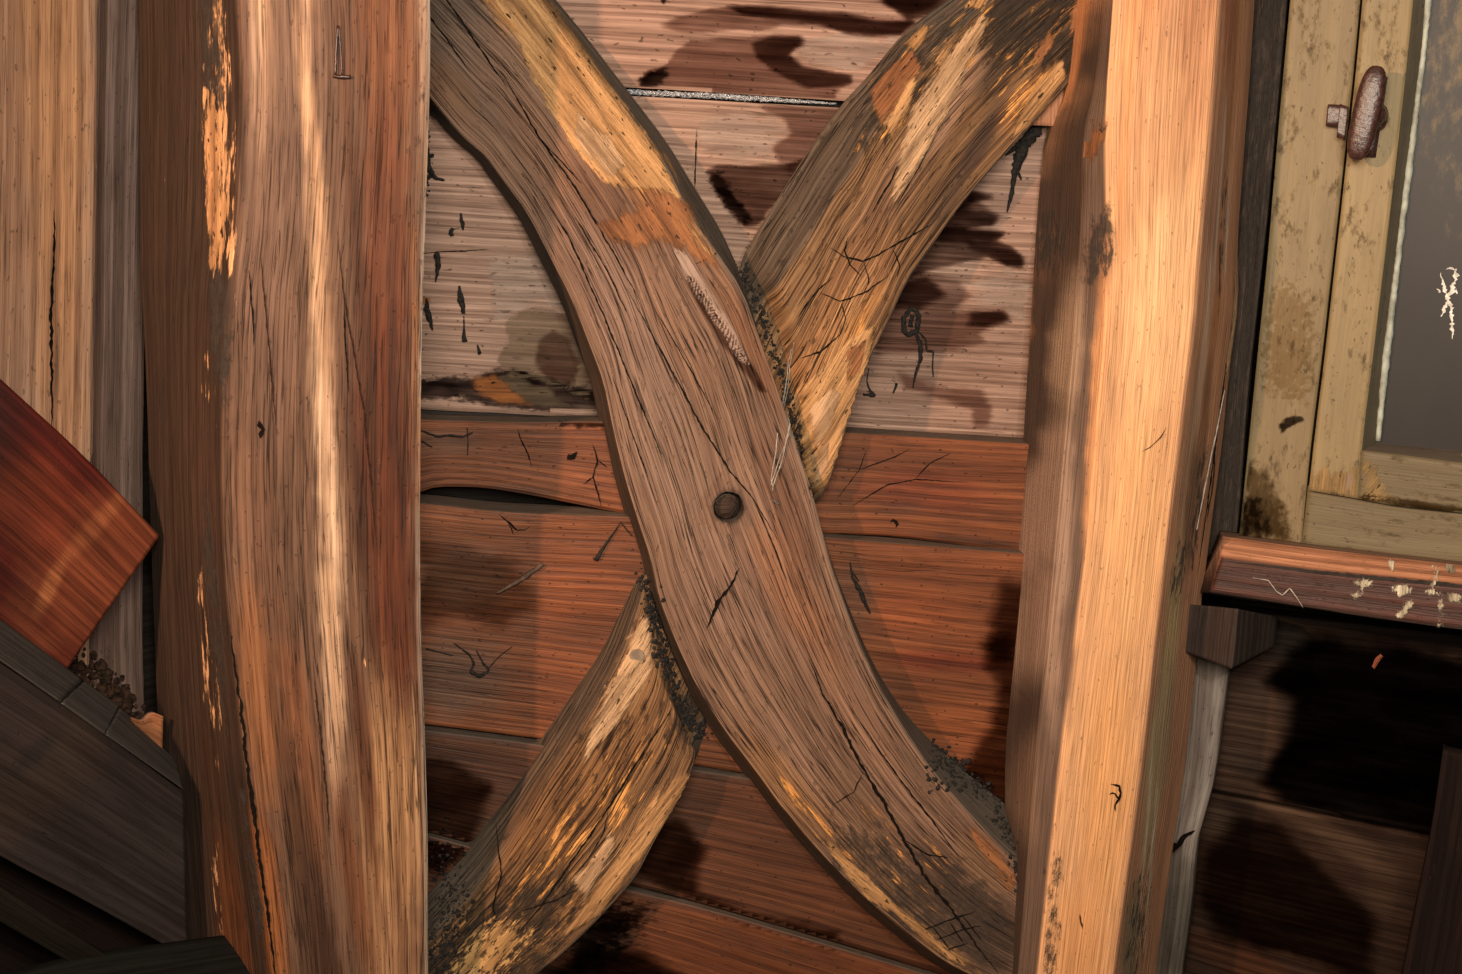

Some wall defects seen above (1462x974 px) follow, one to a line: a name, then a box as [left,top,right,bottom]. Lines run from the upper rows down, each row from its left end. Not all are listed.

crack [796,124,942,417]
crack [229,625,276,974]
crack [808,658,998,973]